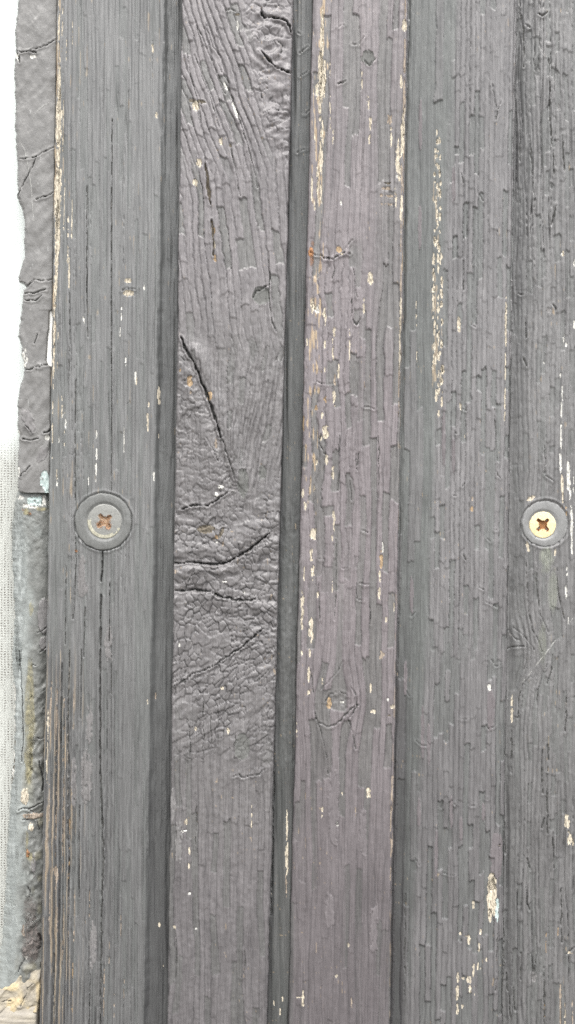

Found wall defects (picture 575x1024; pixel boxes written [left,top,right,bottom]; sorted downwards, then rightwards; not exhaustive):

crack [252,10,304,74]
peeling [311,9,334,211]
peeling [380,0,407,252]
crack [22,120,113,498]
crack [181,338,235,509]
peeling [303,297,351,441]
peeling [418,129,465,474]
crack [181,630,261,683]
crack [175,530,269,601]
peeling [300,528,323,695]
crack [19,539,112,1024]
peeling [455,833,503,1014]